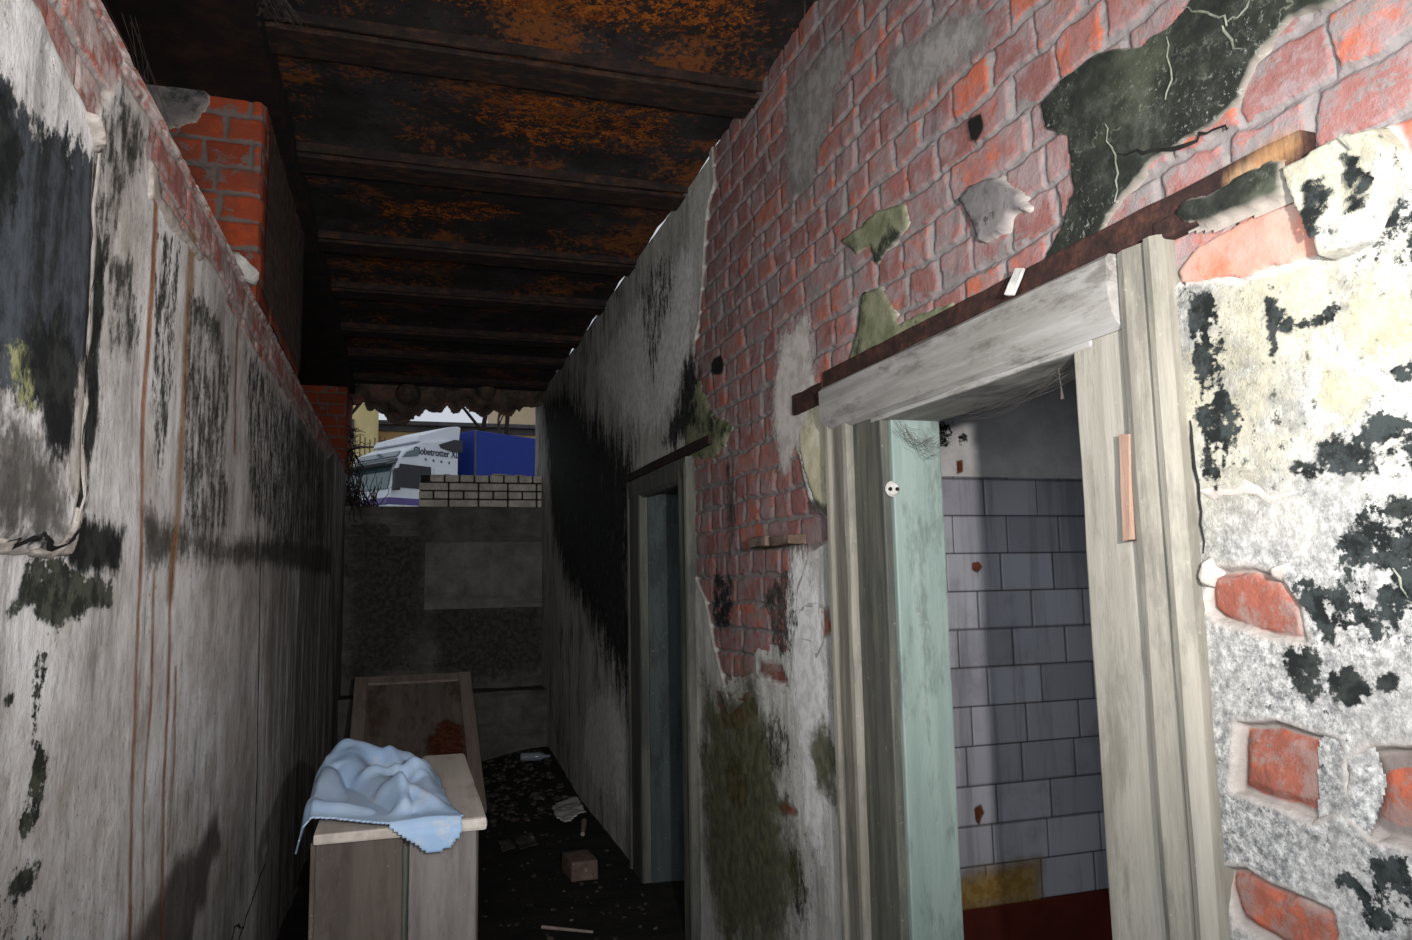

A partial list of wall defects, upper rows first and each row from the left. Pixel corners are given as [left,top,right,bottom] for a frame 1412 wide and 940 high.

rust [470,90,683,151]
rust [434,0,775,46]
crack [1104,123,1229,202]
crack [1165,37,1173,100]
crack [1182,0,1254,50]
flaking render [1107,0,1412,303]
water stain [0,68,542,843]
flaking render [690,0,1190,732]
water stain [1262,283,1412,483]
rust [129,200,195,940]
water stain [1282,493,1412,707]
flaking render [1219,703,1412,869]